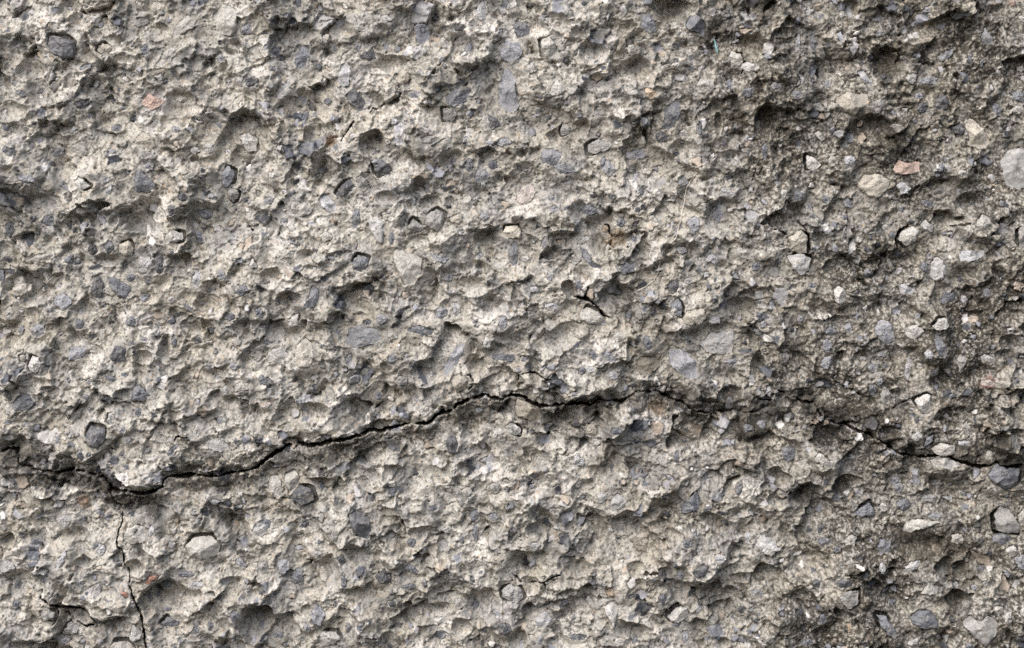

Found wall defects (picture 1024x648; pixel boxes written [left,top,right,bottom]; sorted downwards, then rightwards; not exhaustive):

crack [574,286,609,318]
crack [1,371,1023,648]